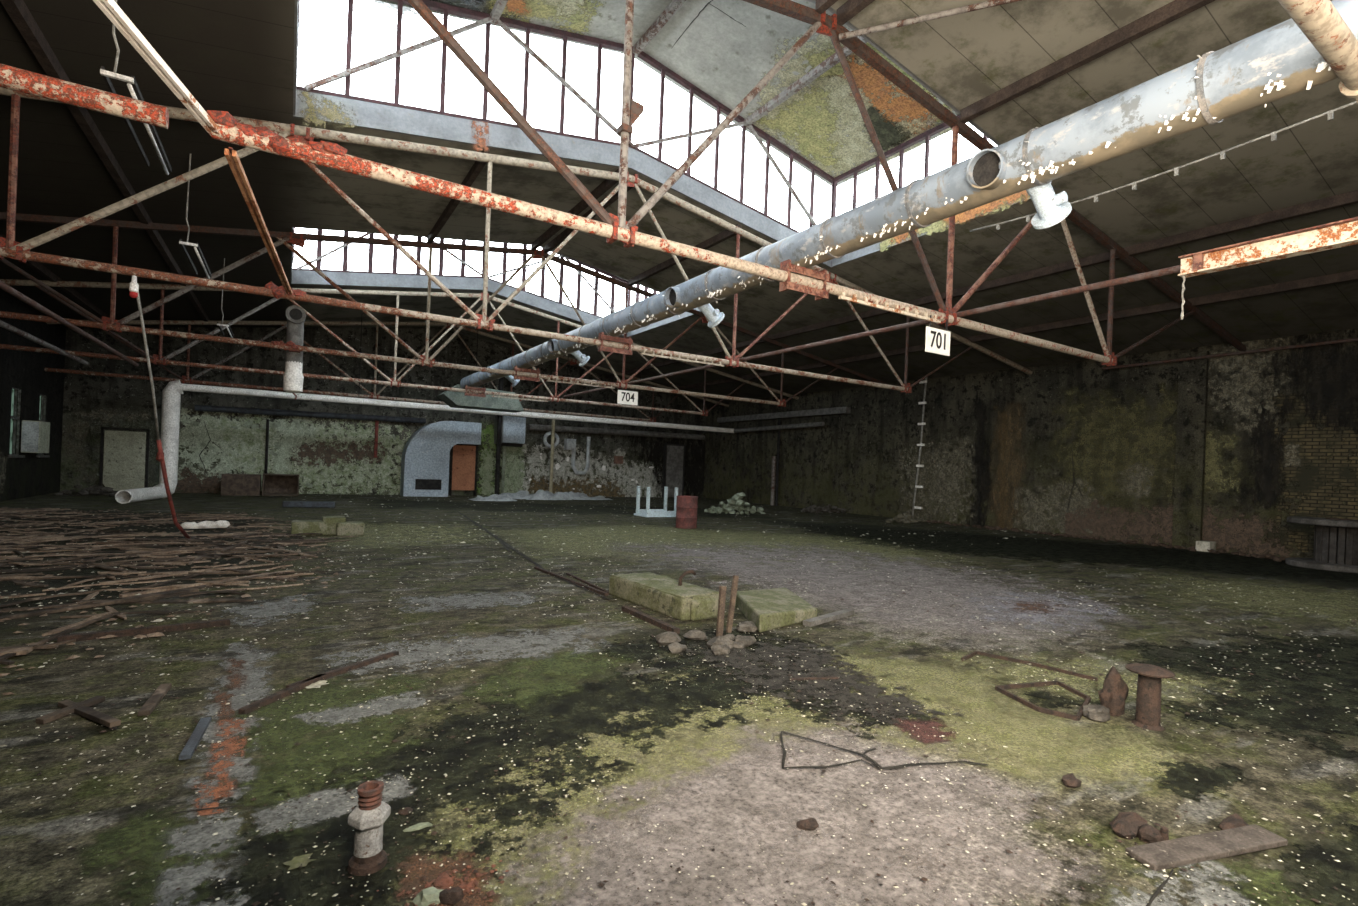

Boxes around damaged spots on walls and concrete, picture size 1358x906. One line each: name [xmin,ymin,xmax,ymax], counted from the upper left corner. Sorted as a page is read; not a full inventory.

leakage [360,0,590,24]
corrosion [471,121,489,151]
leakage [756,42,951,168]
peeling [174,407,414,495]
peeling [499,444,663,497]
leakage [801,397,1358,582]
corrosion [194,658,247,816]
leakage [81,628,1245,906]